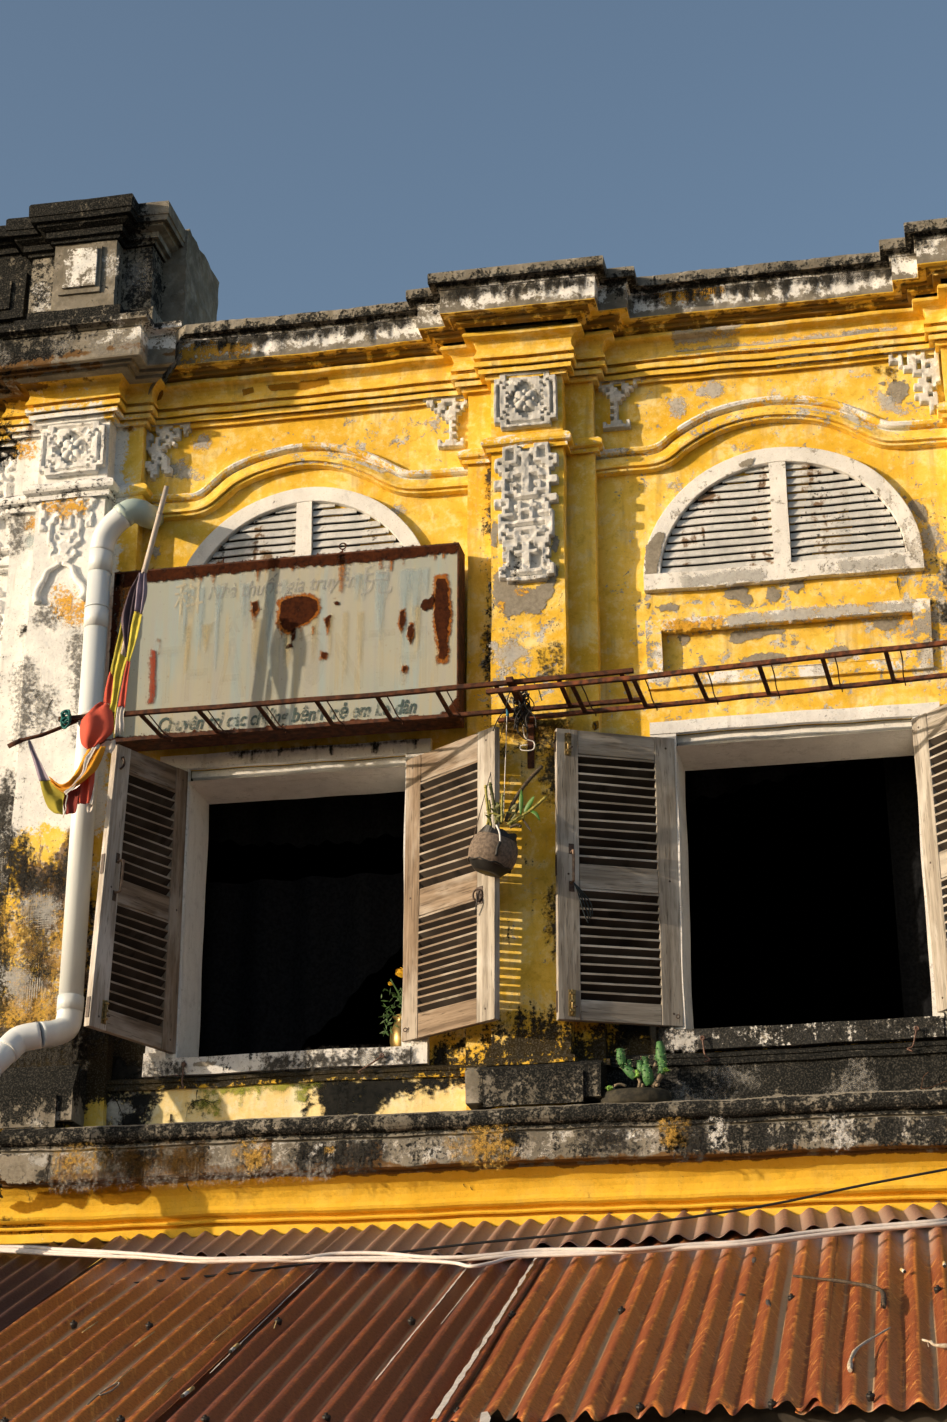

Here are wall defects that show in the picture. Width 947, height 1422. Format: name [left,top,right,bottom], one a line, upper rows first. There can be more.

water stain [444,276,588,301]
peeling [645,532,665,574]
peeling [903,495,940,553]
peeling [51,584,86,626]
rust [108,542,459,675]
peeling [721,581,804,607]
water stain [11,604,83,752]
rust [147,640,160,704]
peeling [728,628,791,669]
water stain [0,770,68,1009]
water stain [239,1038,466,1117]
water stain [0,1142,212,1235]